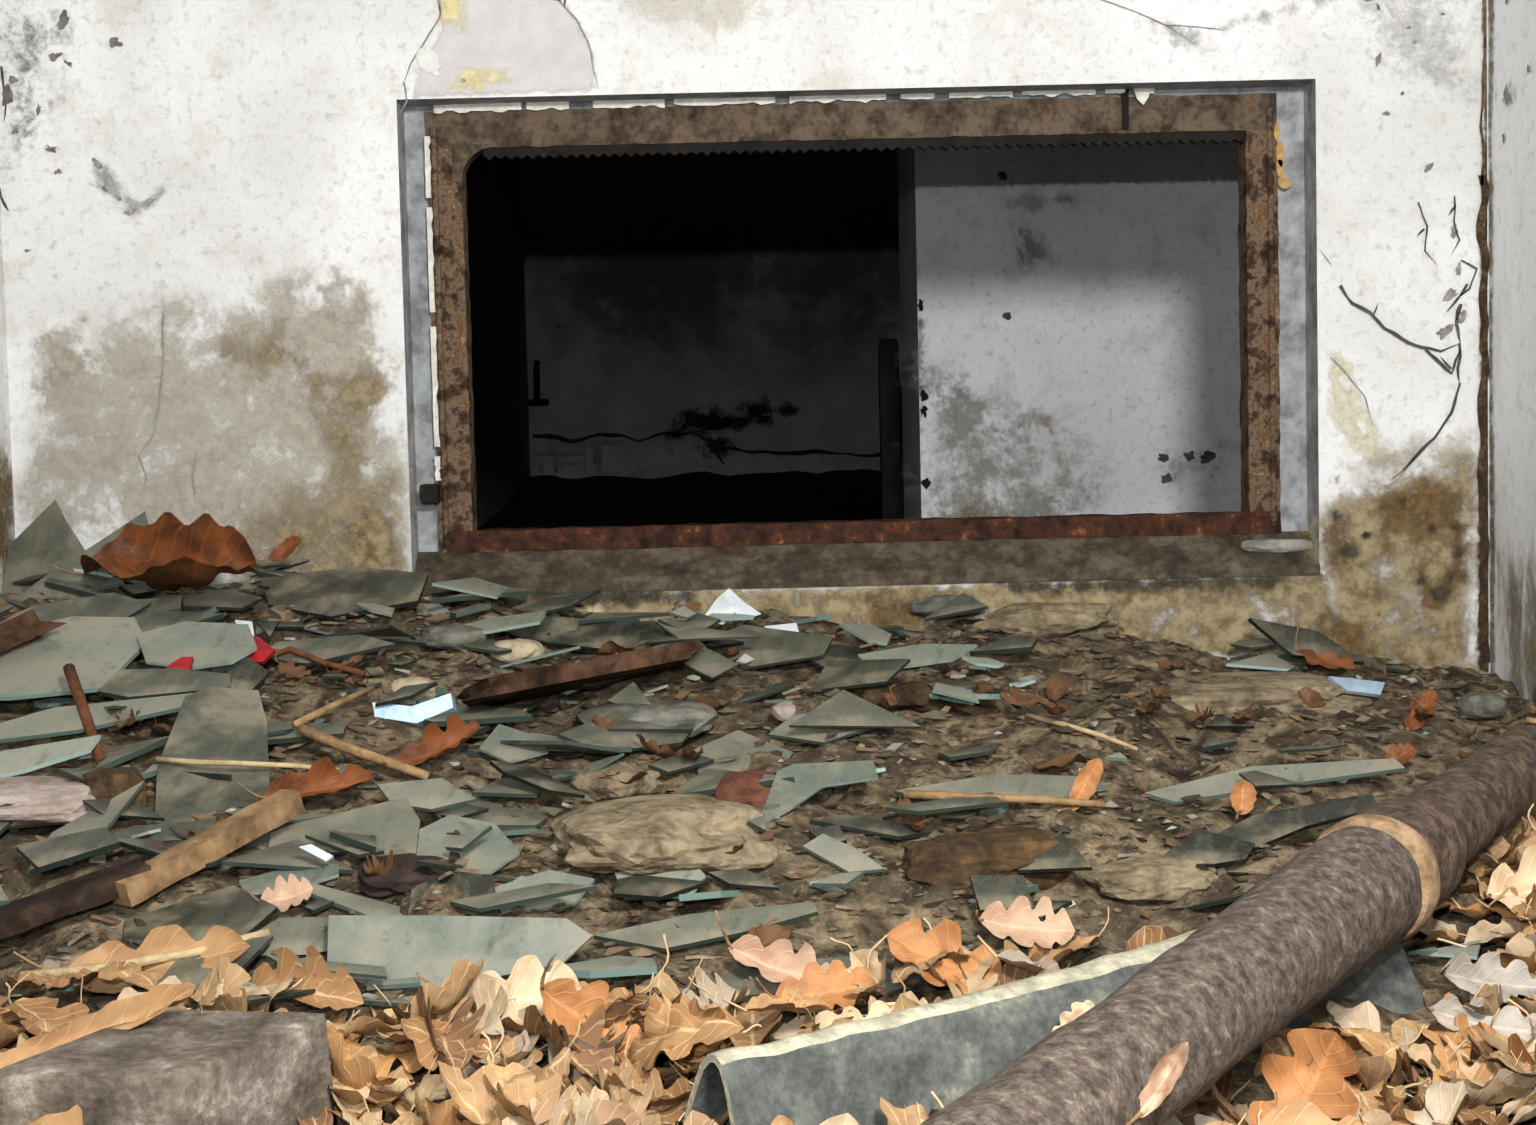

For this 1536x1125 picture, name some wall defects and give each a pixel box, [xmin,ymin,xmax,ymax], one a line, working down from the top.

flaking render [414,0,1154,114]
leakage [30,275,407,571]
corrosion [427,0,1495,674]
crack [1321,196,1478,490]
leakage [1503,569,1536,706]